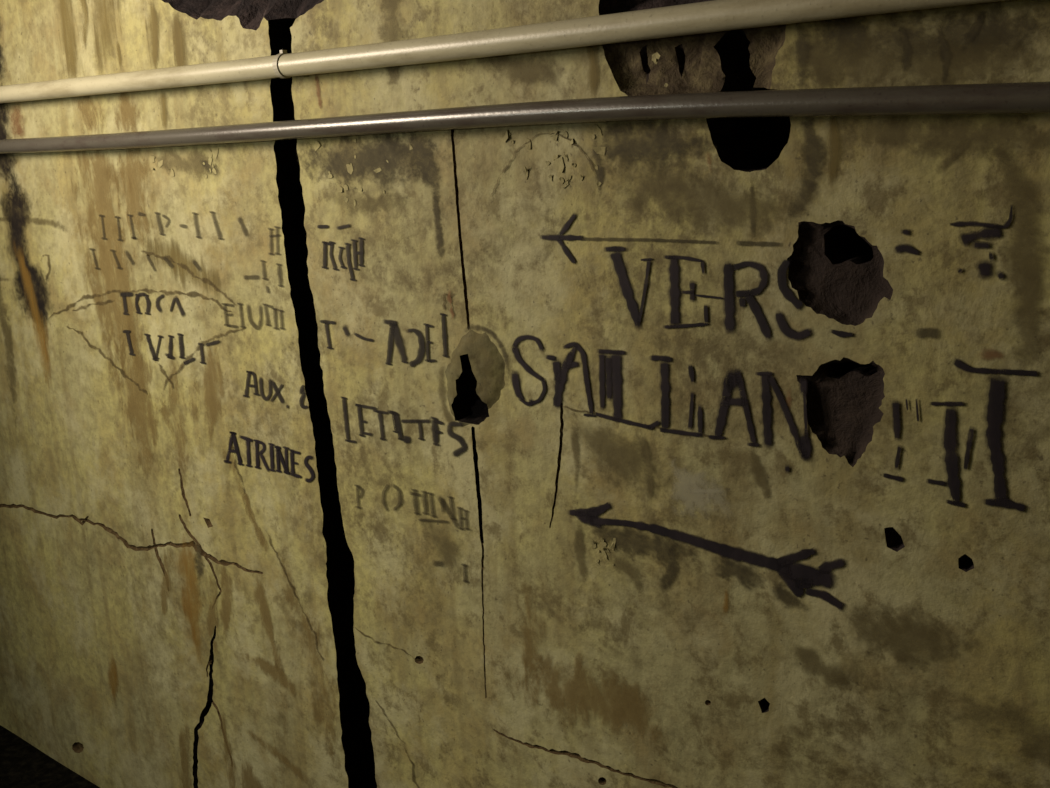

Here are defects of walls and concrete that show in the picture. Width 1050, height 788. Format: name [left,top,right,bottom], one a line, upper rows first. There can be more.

flaking render [162,0,324,30]
flaking render [598,0,712,15]
flaking render [602,24,786,96]
water stain [0,103,8,140]
hole [706,117,791,172]
water stain [0,153,57,364]
flaking render [787,220,893,326]
water stain [0,294,15,399]
crack [0,18,419,788]
flaking render [796,357,885,467]